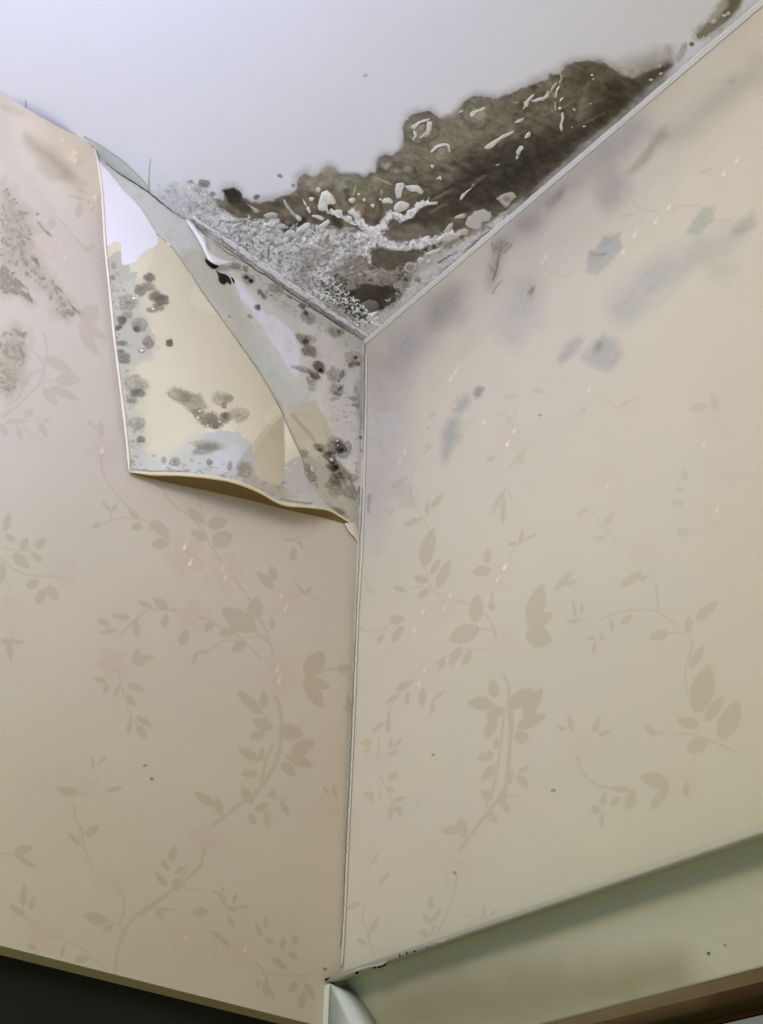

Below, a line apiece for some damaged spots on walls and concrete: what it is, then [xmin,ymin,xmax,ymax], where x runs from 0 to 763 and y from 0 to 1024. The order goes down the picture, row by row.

damp [159,0,742,407]
mould [0,188,77,317]
mould [0,329,26,391]
mould [124,376,148,402]
mould [130,418,145,442]
mould [115,273,173,363]
mould [194,441,220,465]
mould [167,389,248,428]
peeling [84,137,365,527]
mould [227,461,251,477]
mould [300,436,362,499]